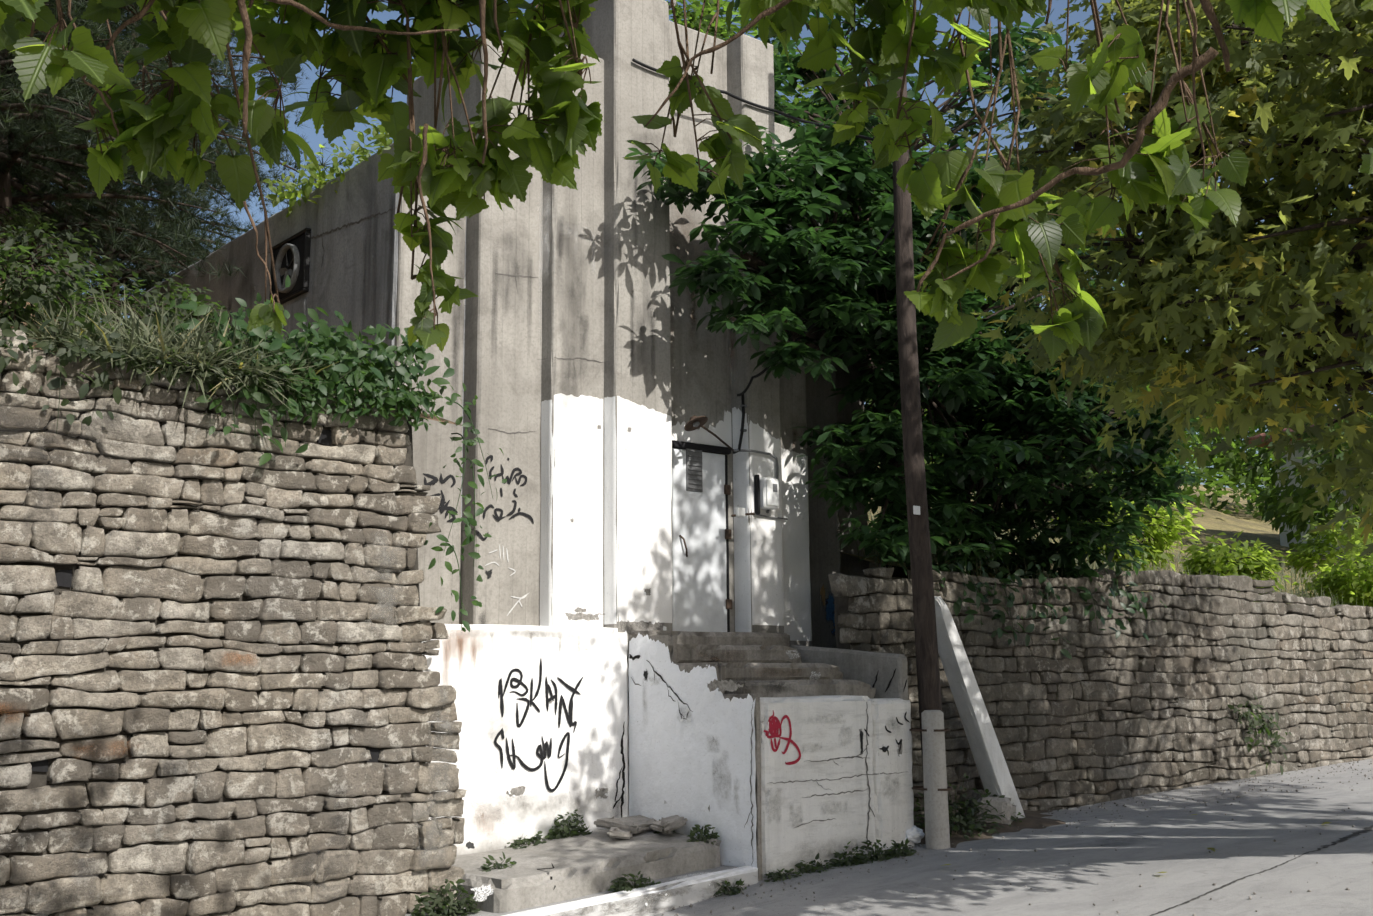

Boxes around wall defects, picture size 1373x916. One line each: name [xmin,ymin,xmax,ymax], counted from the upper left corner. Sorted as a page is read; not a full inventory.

crack [627,654,693,720]
spalling [707,679,744,693]
crack [613,725,625,818]
crack [744,669,907,863]